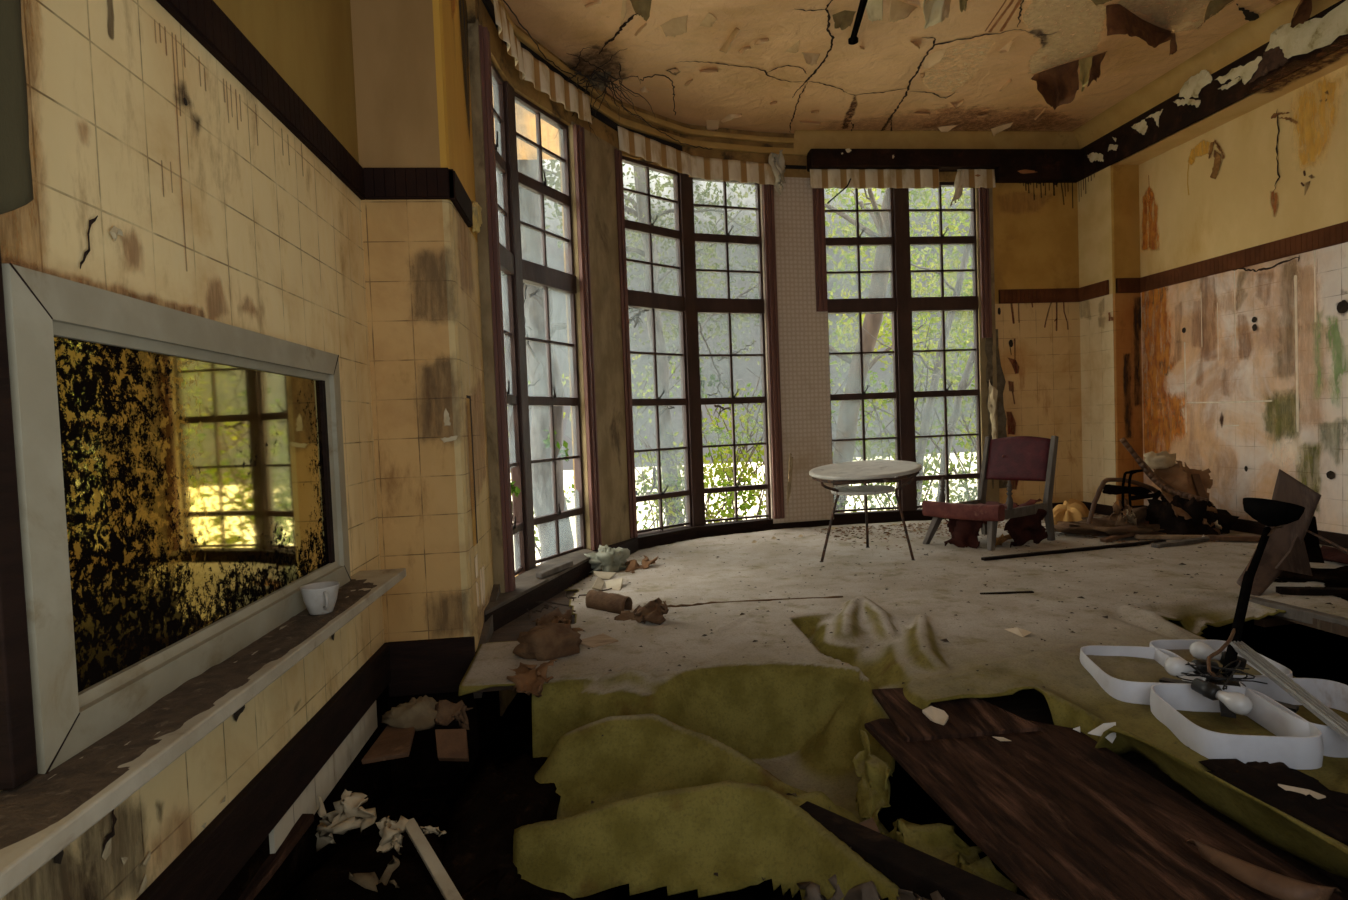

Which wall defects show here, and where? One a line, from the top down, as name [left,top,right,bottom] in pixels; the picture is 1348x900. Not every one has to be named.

crack [599,13,638,55]
peeling [621,0,717,37]
crack [685,0,1030,132]
peeling [832,0,968,78]
flaking render [998,0,1177,120]
peeling [1131,0,1348,135]
leakage [154,19,206,271]
crack [80,215,98,269]
leakage [1,257,257,320]
leakage [121,231,142,268]
spalling [1337,300,1348,313]
leakage [1173,250,1348,465]